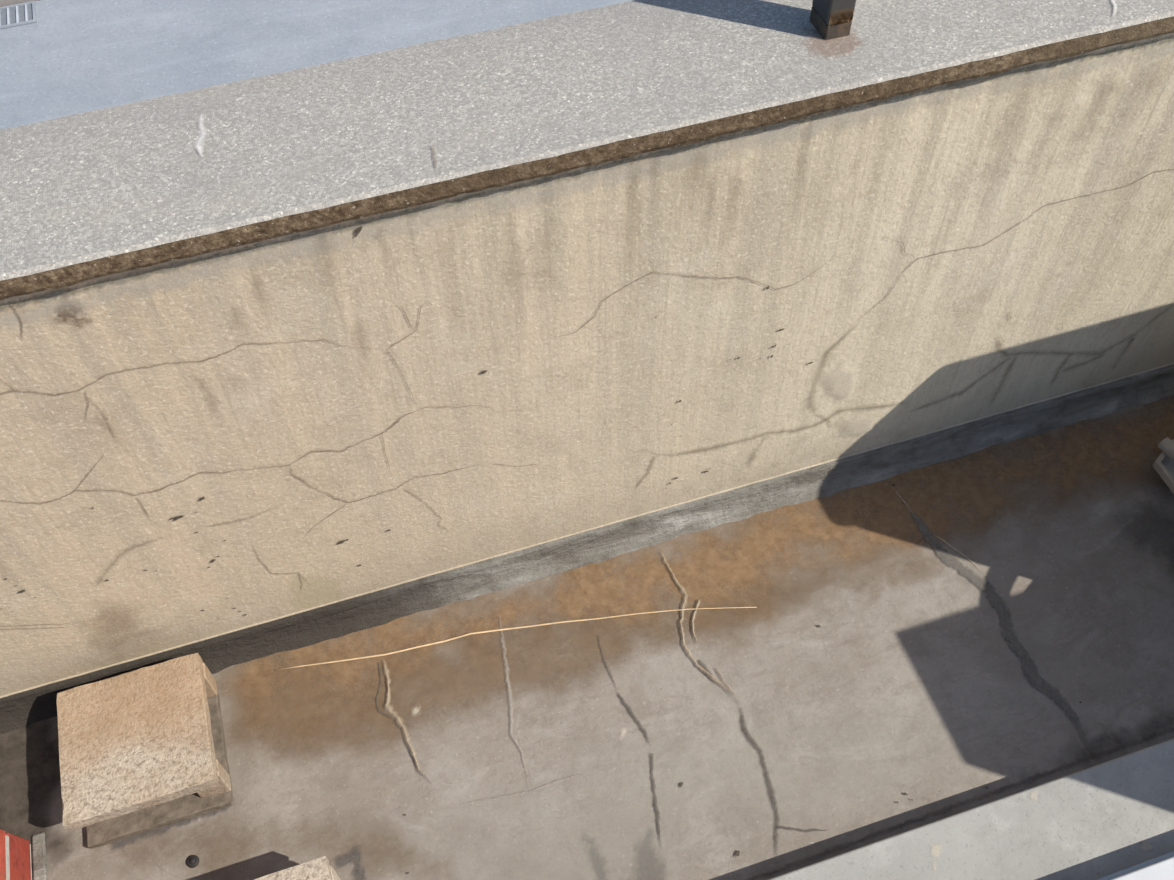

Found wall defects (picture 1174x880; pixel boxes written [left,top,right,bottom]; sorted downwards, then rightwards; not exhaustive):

rust [829,11,854,27]
crack [10,303,23,336]
crack [0,343,269,434]
crack [8,461,230,516]
crack [291,406,463,530]
crack [897,493,1080,728]
crack [376,663,424,774]
crack [598,637,660,840]
crack [663,556,826,845]